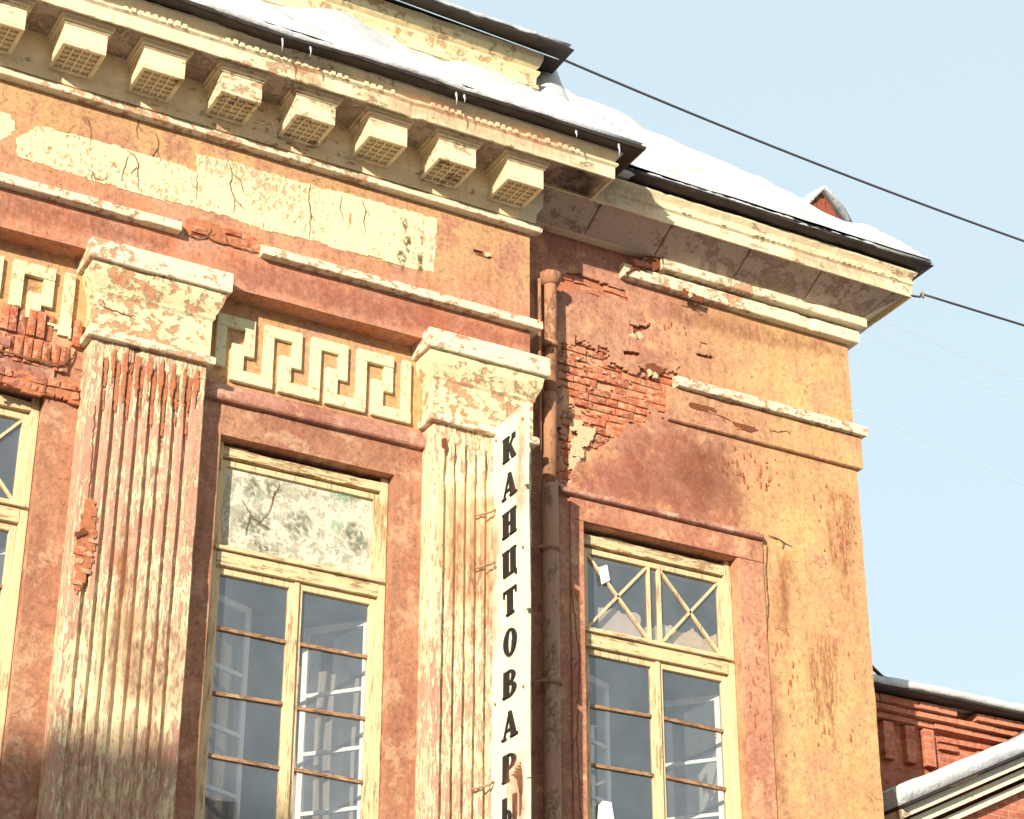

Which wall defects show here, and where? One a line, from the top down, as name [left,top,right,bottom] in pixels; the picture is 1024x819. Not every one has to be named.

crack [88,120,161,189]
peeling [0,112,437,272]
crack [187,163,258,253]
crack [307,184,315,239]
spalling [0,302,83,407]
peeling [102,349,200,446]
spalling [557,309,676,484]
spalling [689,402,717,415]
spalling [733,421,758,433]
spalling [70,497,99,594]
crack [242,485,279,533]